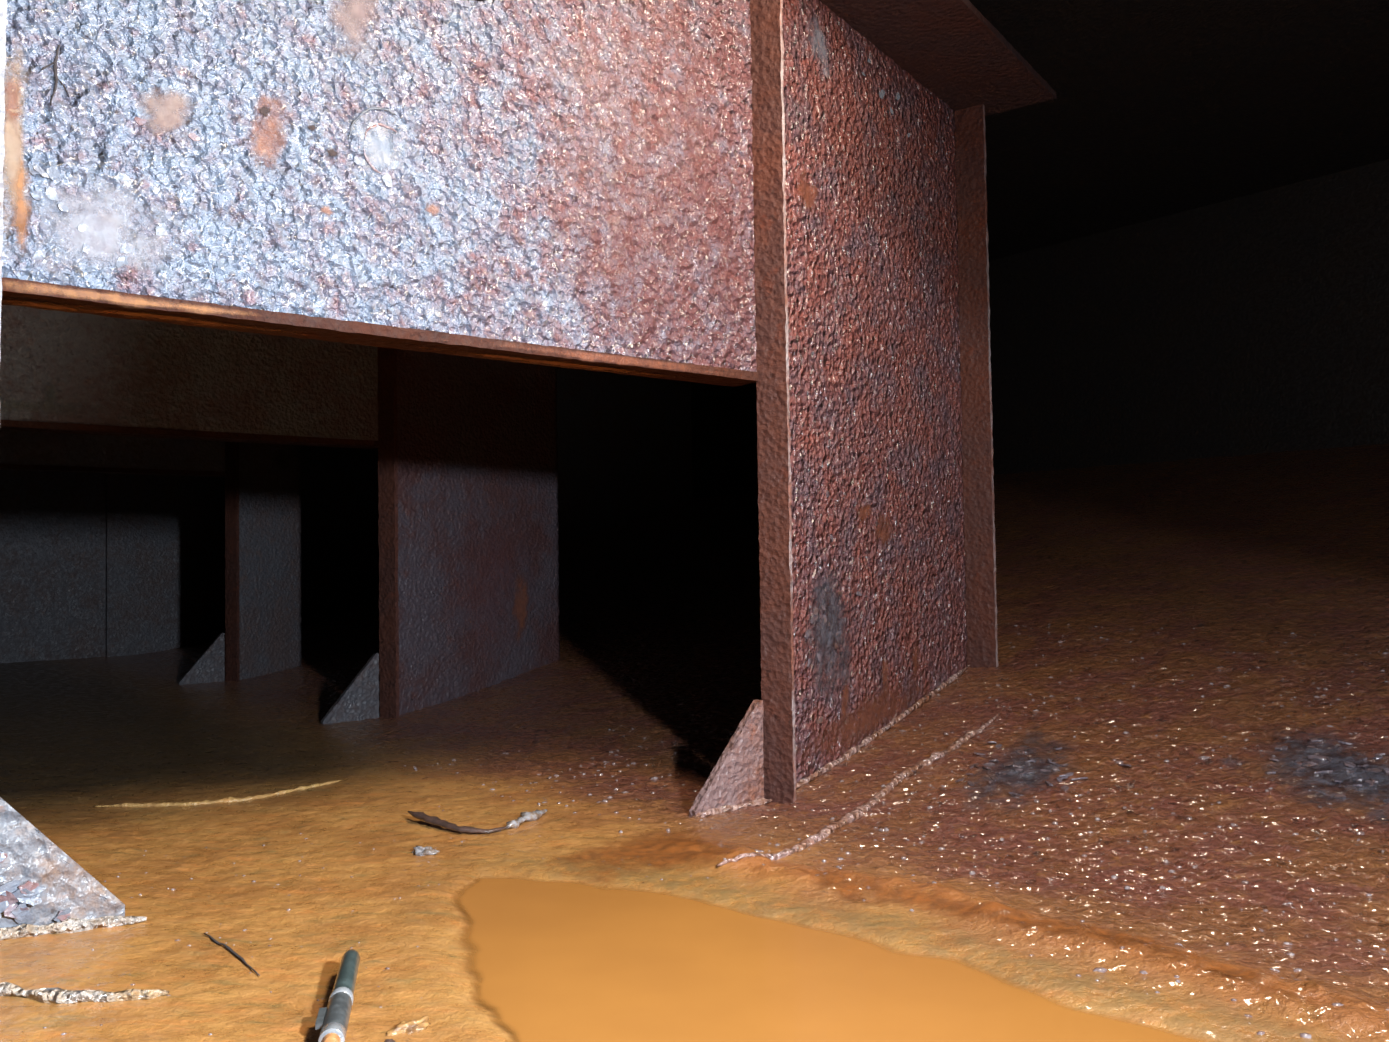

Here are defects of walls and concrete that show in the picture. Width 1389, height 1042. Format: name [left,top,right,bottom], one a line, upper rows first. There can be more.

rust [134,93,200,141]
rust [253,99,279,157]
rust [4,80,29,243]
rust [9,283,251,328]
rust [477,350,685,375]